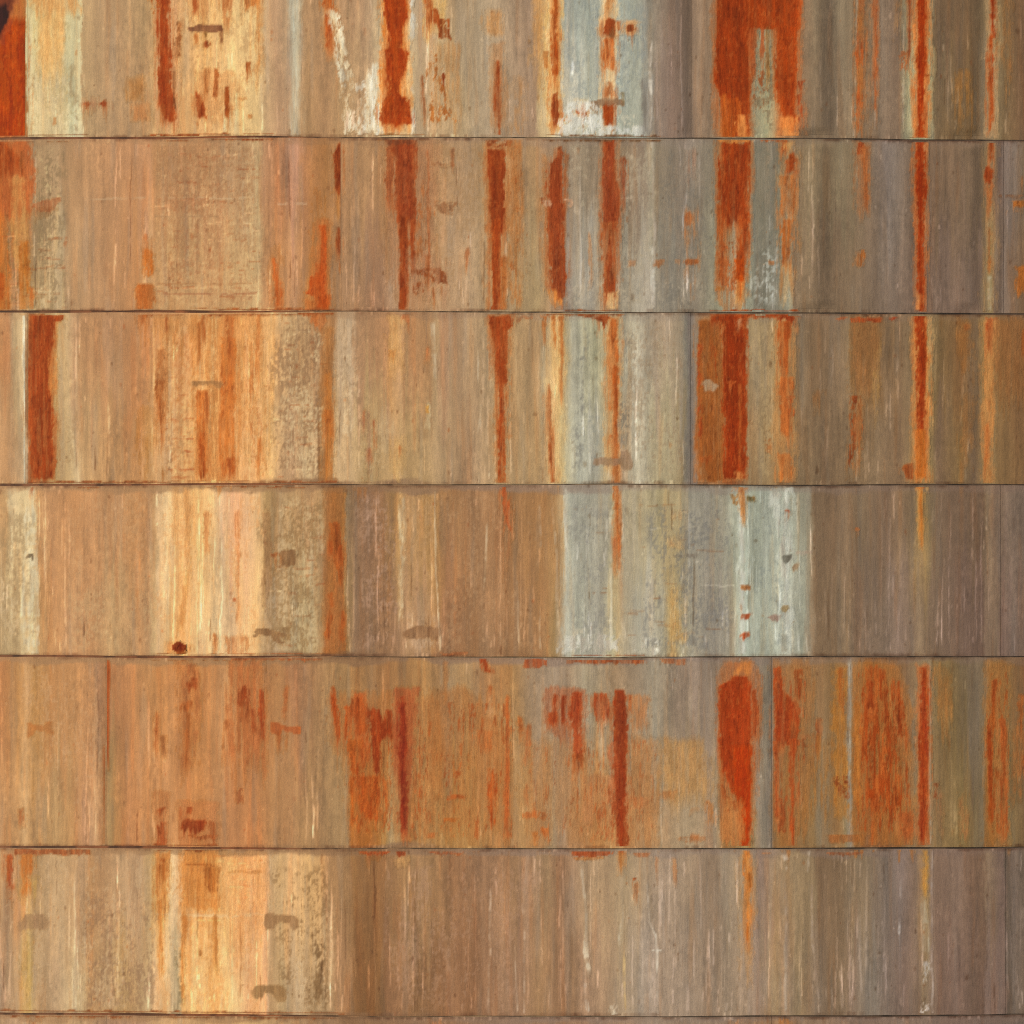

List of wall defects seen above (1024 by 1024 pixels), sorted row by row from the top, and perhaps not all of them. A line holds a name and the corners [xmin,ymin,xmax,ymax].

corrosion [0,0,407,1008]
corrosion [374,0,471,384]
corrosion [478,0,665,584]
corrosion [656,0,810,528]
corrosion [835,0,938,553]
corrosion [324,651,1024,991]